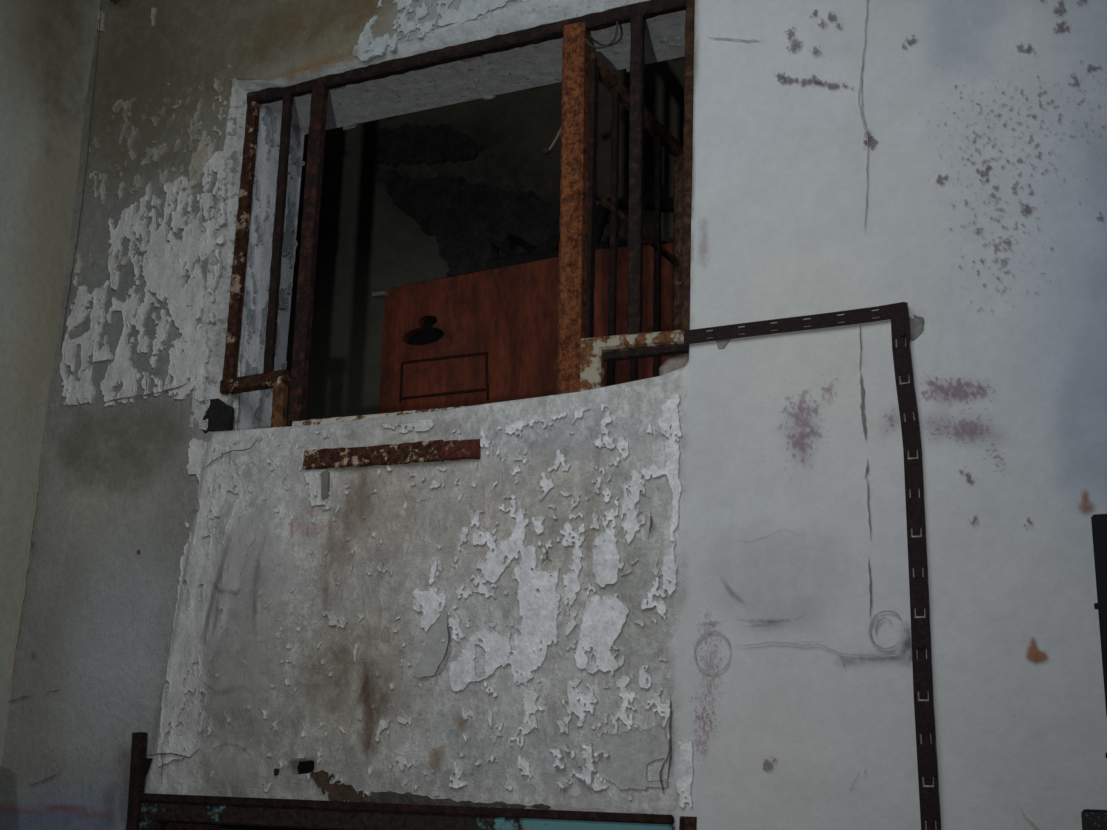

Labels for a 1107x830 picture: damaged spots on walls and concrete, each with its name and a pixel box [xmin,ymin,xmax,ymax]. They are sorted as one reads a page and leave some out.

peeling [352,0,530,62]
crack [858,0,868,225]
peeling [60,64,305,766]
peeling [251,457,350,523]
corrosion [303,439,481,470]
crack [859,327,872,609]
peeling [393,393,683,792]
peeling [375,716,412,742]
peeling [264,752,286,792]
spalling [297,721,551,810]
peeling [676,739,694,808]